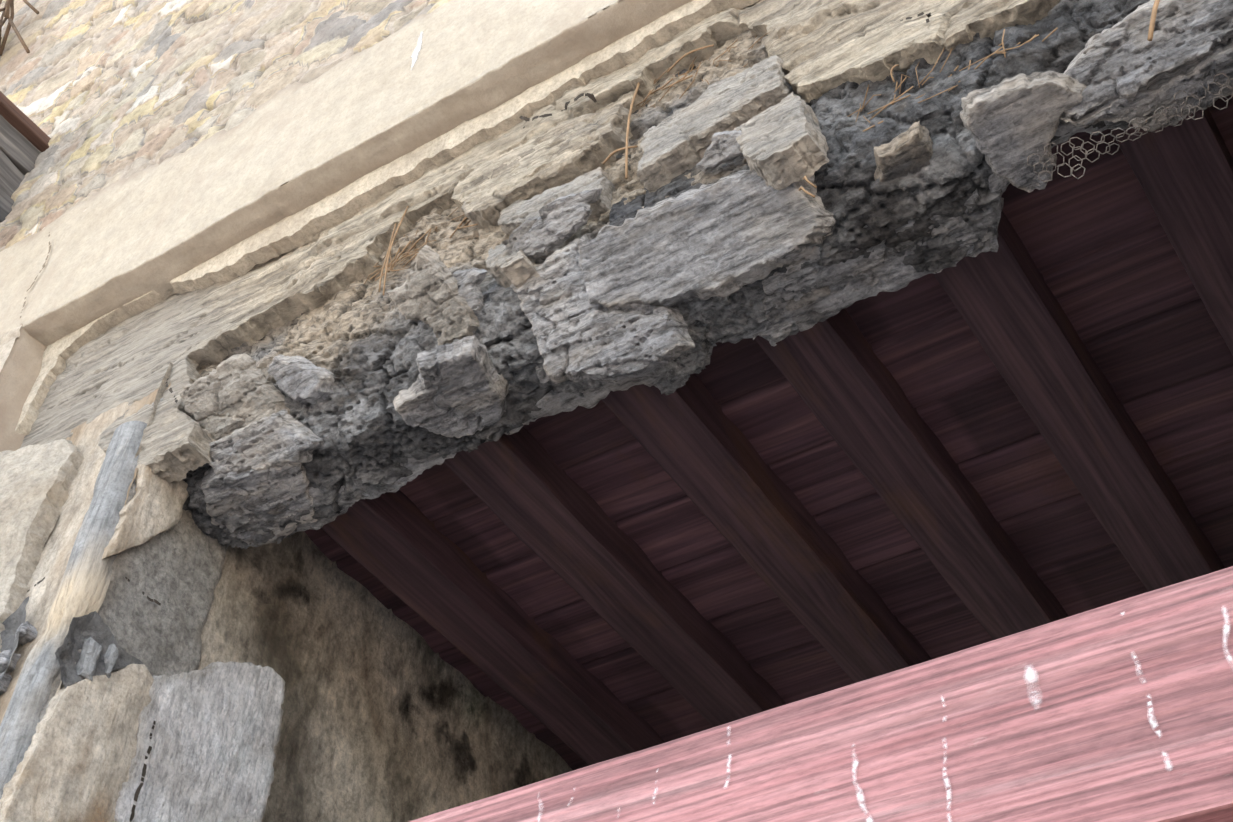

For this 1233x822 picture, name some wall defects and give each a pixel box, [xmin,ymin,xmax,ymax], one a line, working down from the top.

crack [20,234,51,318]
flaking render [101,0,1233,560]
crack [130,721,156,822]